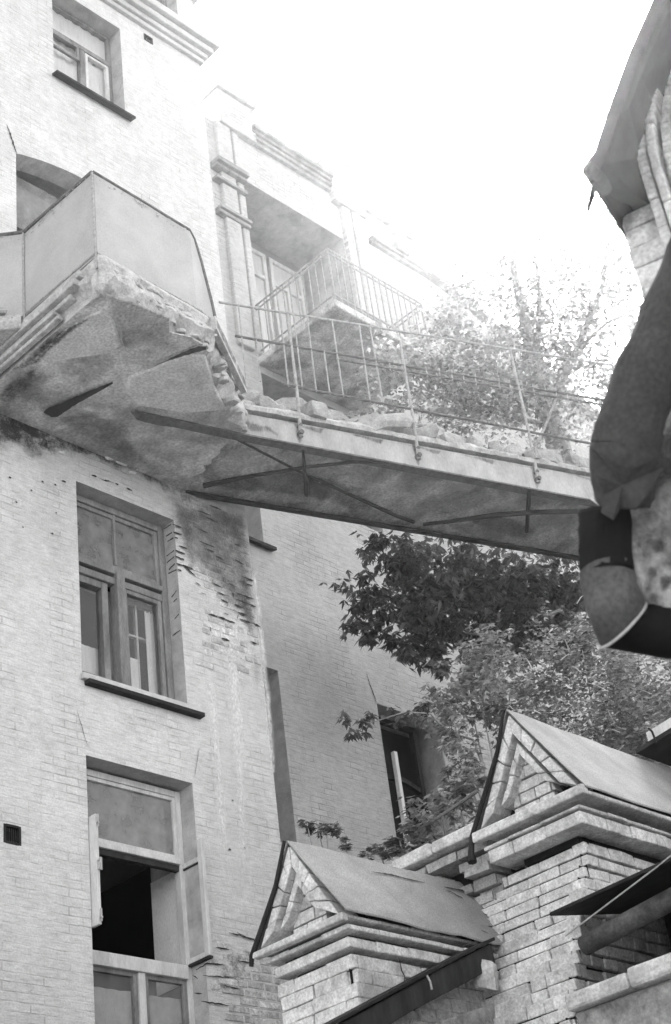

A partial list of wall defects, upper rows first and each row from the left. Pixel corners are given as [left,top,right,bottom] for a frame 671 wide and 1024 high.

flaking render [31,268,248,433]
damp [0,414,133,467]
damp [179,507,260,613]